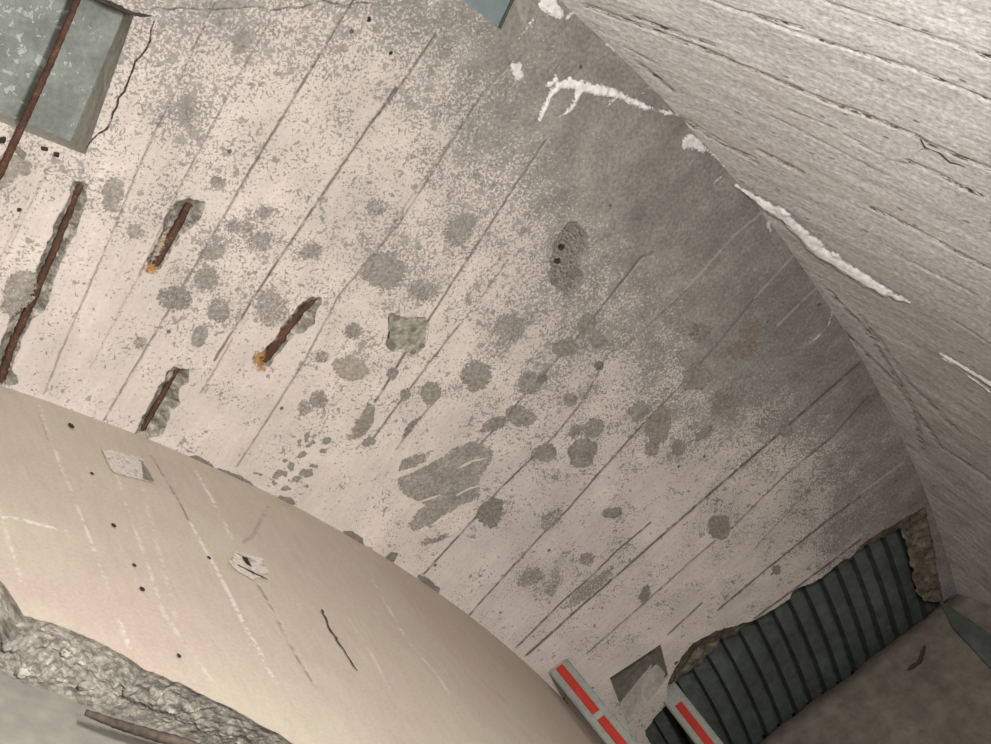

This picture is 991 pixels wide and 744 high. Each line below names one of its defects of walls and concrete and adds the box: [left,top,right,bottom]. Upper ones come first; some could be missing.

crack [86,0,369,148]
efflorescence [537,74,678,122]
crack [920,139,965,167]
peeling [101,177,125,212]
efflorescence [734,184,911,304]
spalling [0,181,87,386]
efflorescence [939,352,991,393]
peeling [708,515,731,540]
spalling [856,507,943,602]
spalling [0,582,292,744]
crack [321,609,358,671]
spalling [664,623,745,684]